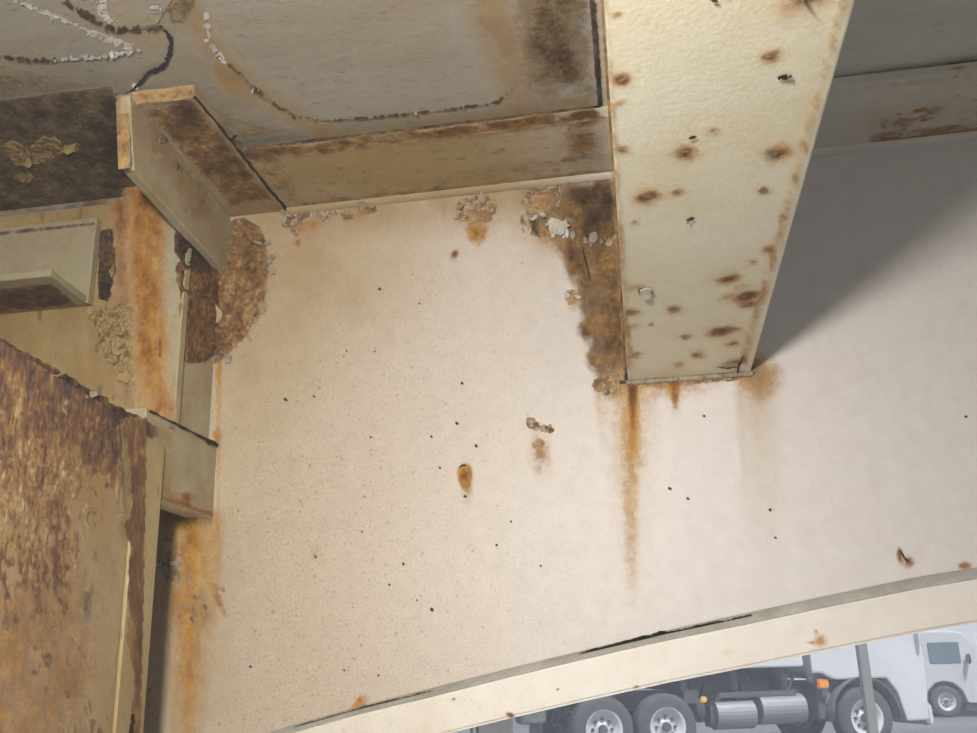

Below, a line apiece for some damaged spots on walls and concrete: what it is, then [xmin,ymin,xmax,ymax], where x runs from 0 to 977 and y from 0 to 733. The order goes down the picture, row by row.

peeling [14,0,141,62]
crack [124,29,173,95]
water stain [186,7,274,102]
water stain [478,0,593,117]
peeling [520,186,573,243]
rust [634,189,660,203]
rust [132,0,642,540]
peeling [564,289,581,305]
rust [708,281,776,400]
rust [0,68,276,733]
rust [667,382,683,408]
peeling [526,417,554,458]